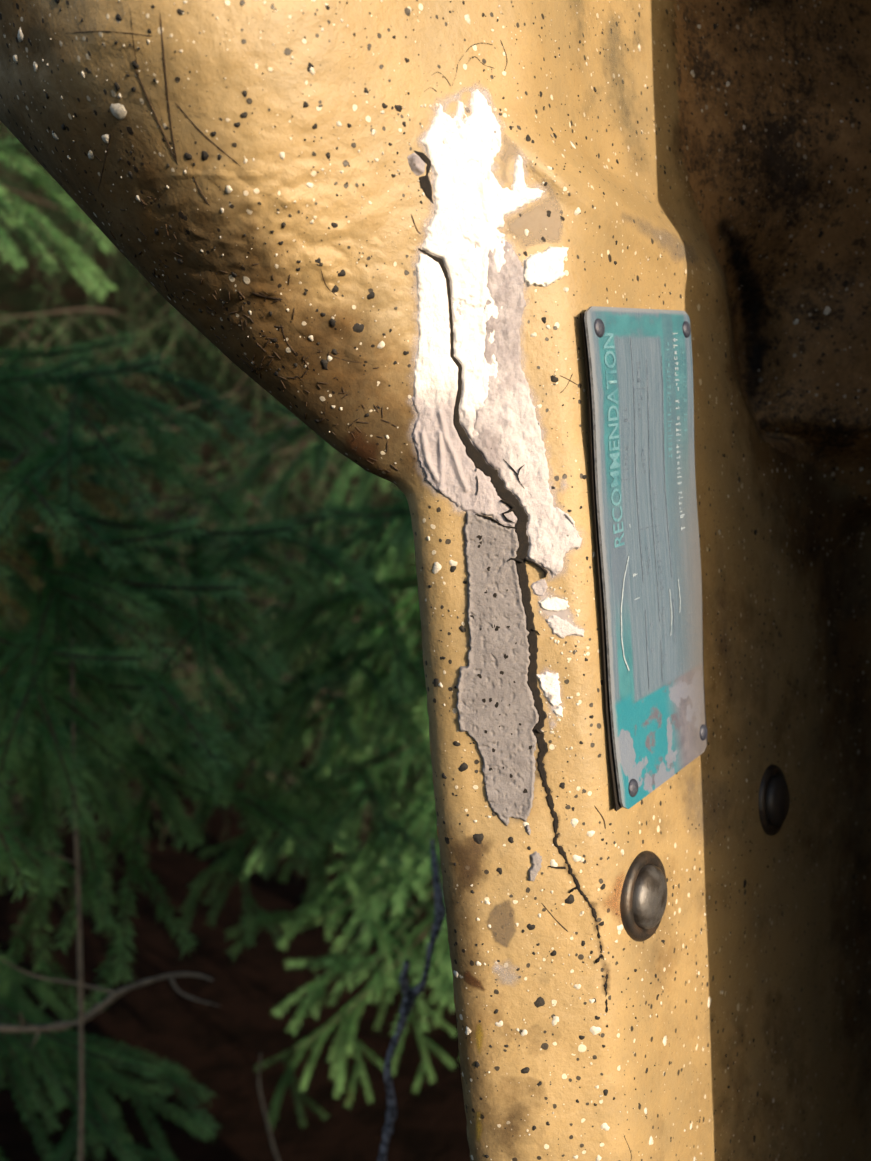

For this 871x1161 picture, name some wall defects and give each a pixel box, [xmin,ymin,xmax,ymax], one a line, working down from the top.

peeling [411,89,584,639]
crack [418,248,609,1027]
peeling [536,672,563,717]
damp [719,219,769,398]